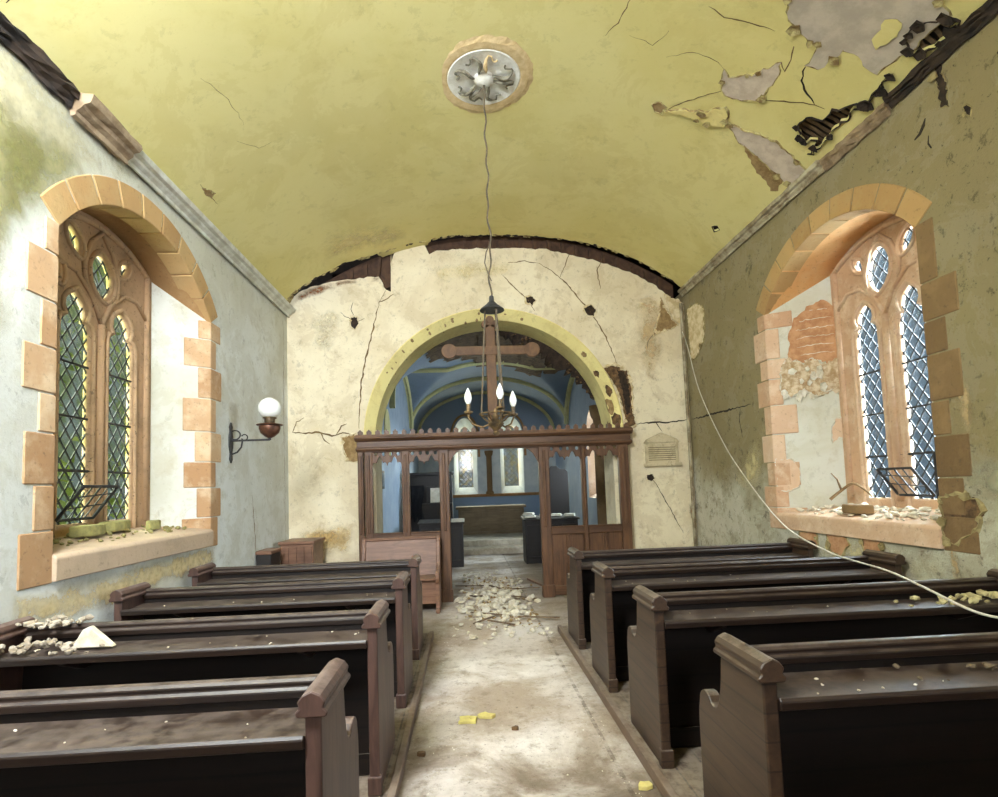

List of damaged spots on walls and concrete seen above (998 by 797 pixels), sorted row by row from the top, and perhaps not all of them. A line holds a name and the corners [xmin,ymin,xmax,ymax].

crack [606,0,723,68]
crack [710,7,774,31]
water stain [0,51,87,232]
peeling [666,0,953,191]
crack [283,290,393,444]
spalling [287,234,706,361]
crack [505,256,617,363]
spalling [593,362,637,428]
flaking render [779,300,840,403]
flaking render [936,490,988,547]
water stain [19,552,211,618]